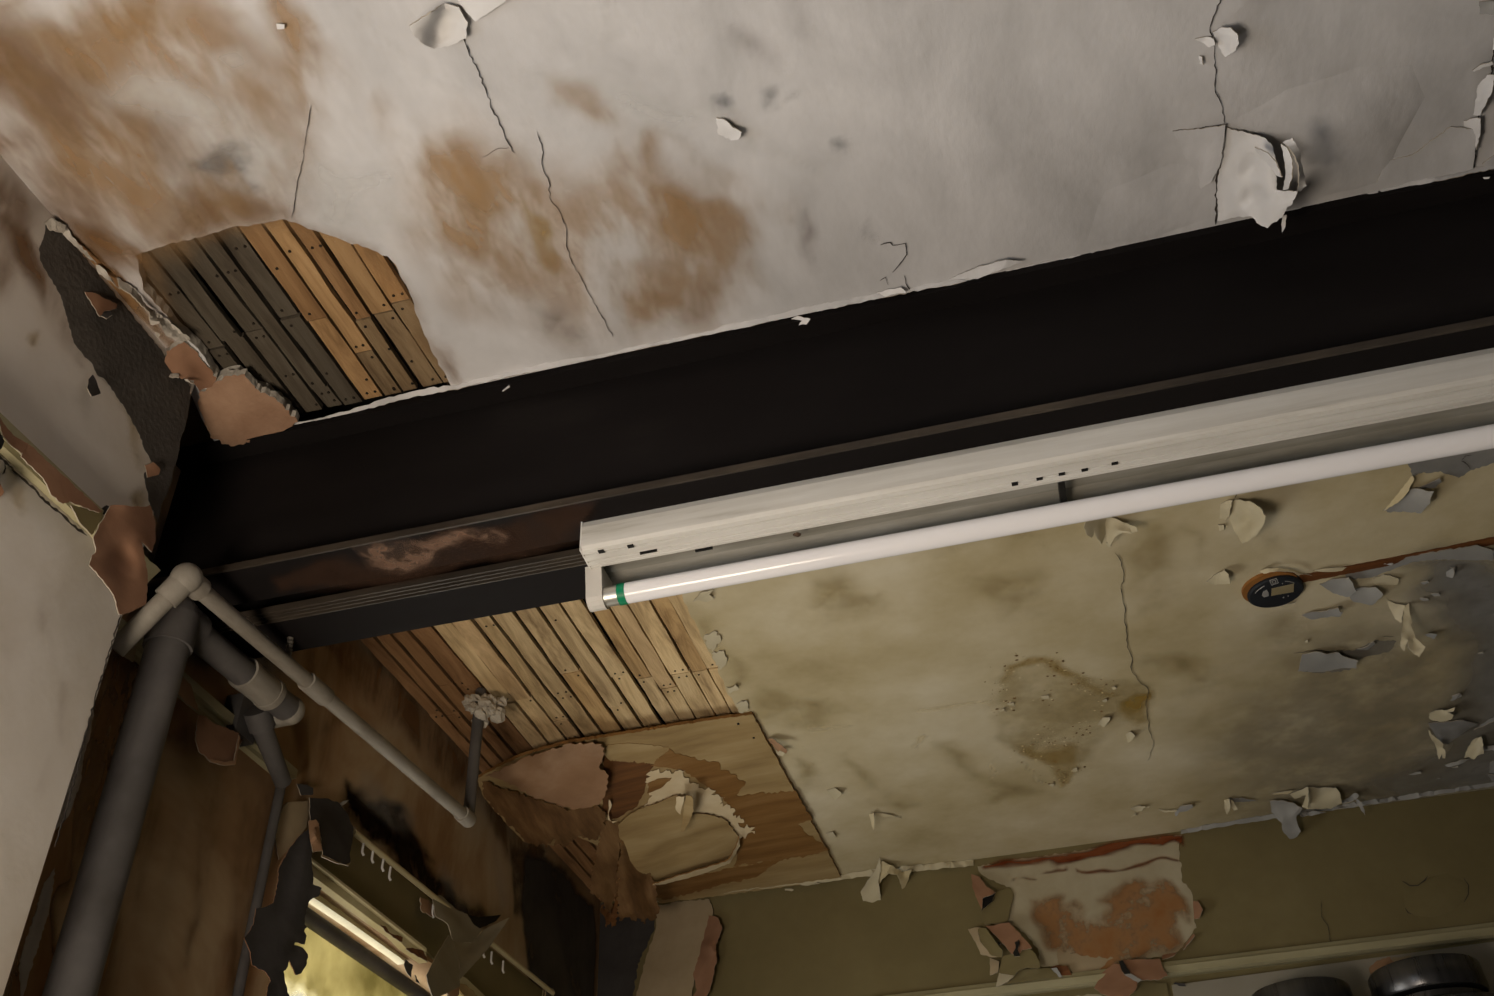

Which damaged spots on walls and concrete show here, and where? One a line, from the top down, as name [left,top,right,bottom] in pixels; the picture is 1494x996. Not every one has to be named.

damp [273,0,301,52]
peeling [410,0,506,49]
damp [0,0,206,317]
damp [190,190,266,224]
damp [428,147,514,251]
crack [463,39,613,336]
crack [1177,0,1226,224]
peeling [1173,125,1307,232]
spalling [39,218,300,523]
corrosion [369,531,503,570]
crack [1115,553,1154,753]
spalling [978,835,1197,973]